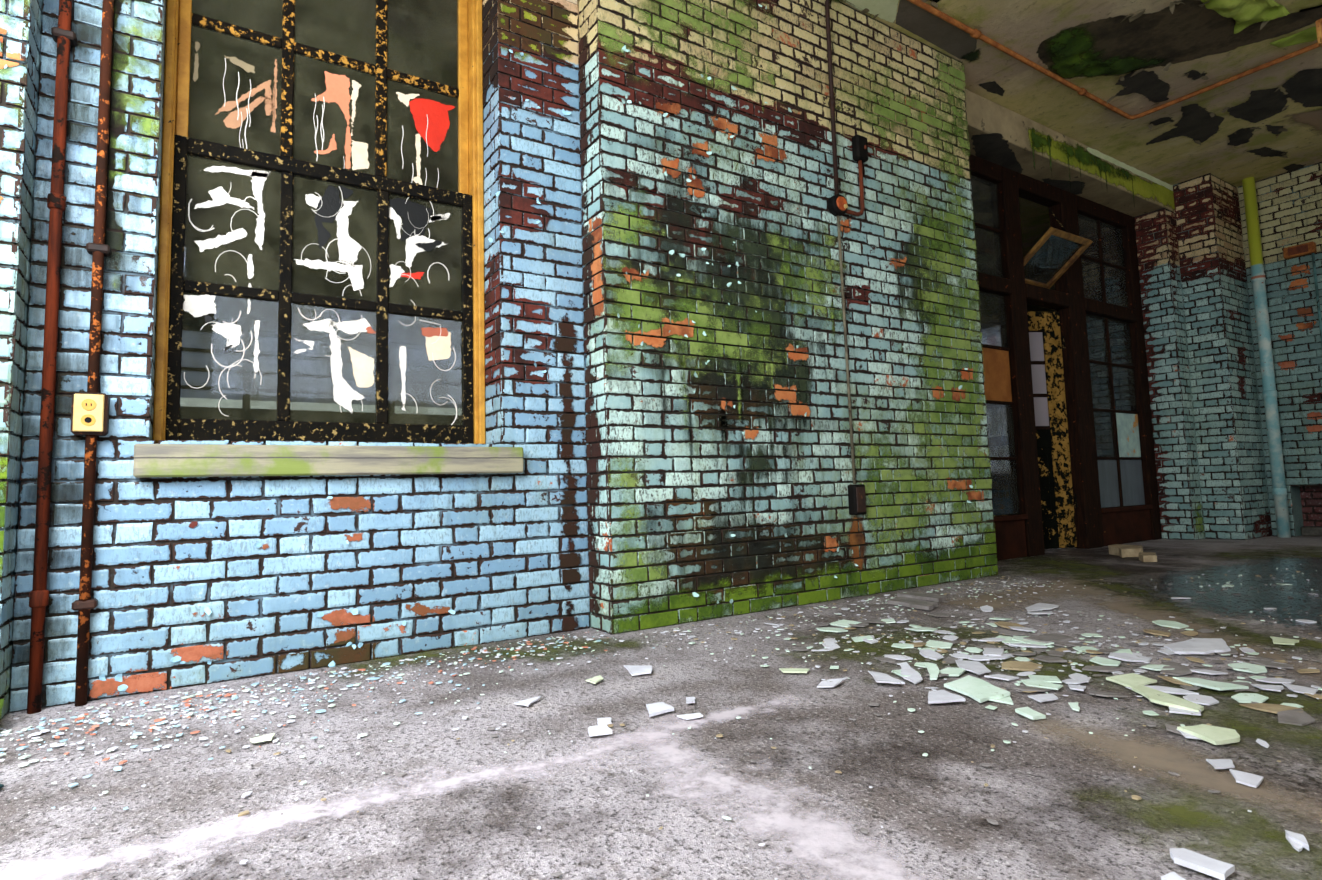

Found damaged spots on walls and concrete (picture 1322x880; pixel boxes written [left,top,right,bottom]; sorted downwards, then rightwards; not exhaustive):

peeling [867,135,908,163]
flaking render [979,81,1005,96]
peeling [971,133,1023,173]
flaking render [1036,0,1322,195]
peeling [0,0,832,796]
damp [608,156,848,602]
peeling [844,282,871,310]
damp [894,210,952,346]
spalling [932,367,973,401]
peeling [1087,147,1247,533]
peeling [624,491,1322,735]
spalling [1190,739,1322,820]